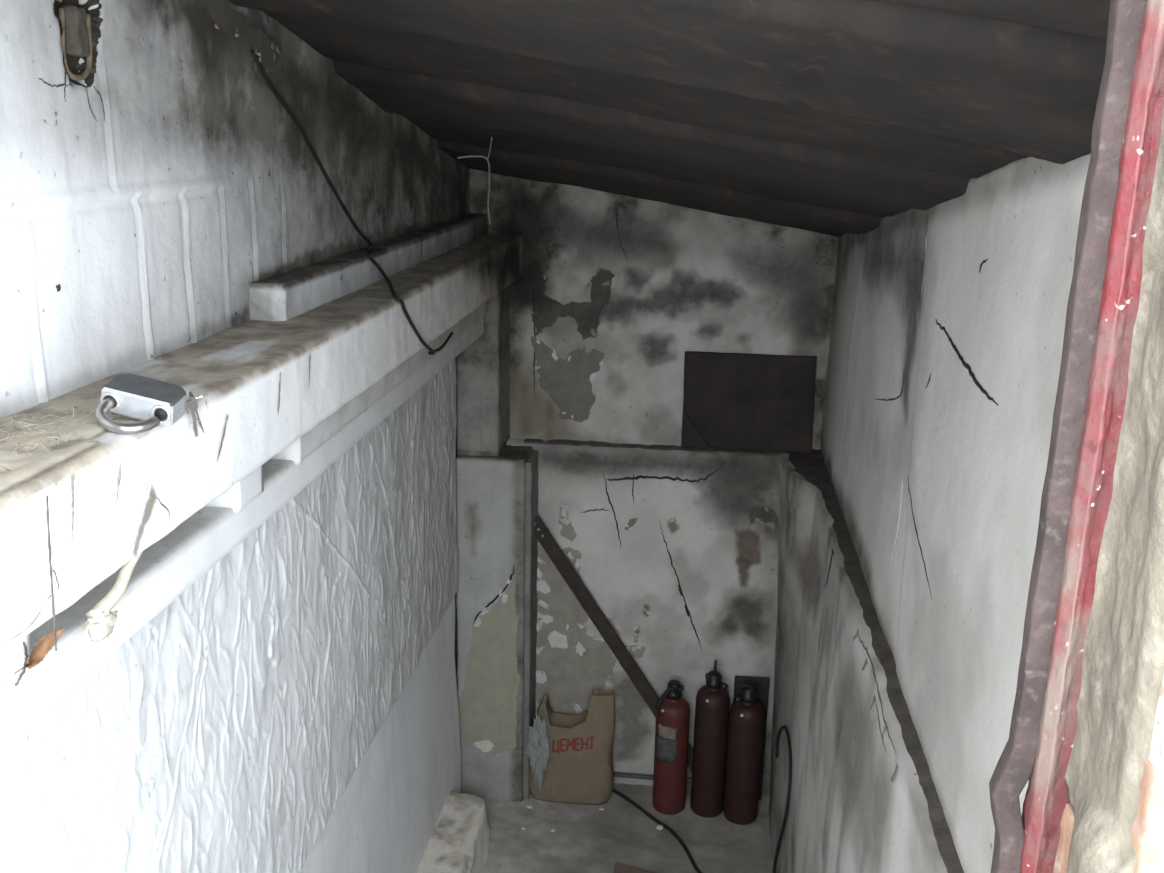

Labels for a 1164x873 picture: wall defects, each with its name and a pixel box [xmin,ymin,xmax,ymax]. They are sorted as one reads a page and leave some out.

water stain [598,273,739,321]
peeling [531,267,615,422]
water stain [645,337,668,360]
crack [878,368,931,401]
crack [935,319,998,406]
crack [580,461,726,548]
flaking render [536,505,650,716]
crack [659,521,703,653]
peeling [460,570,521,756]